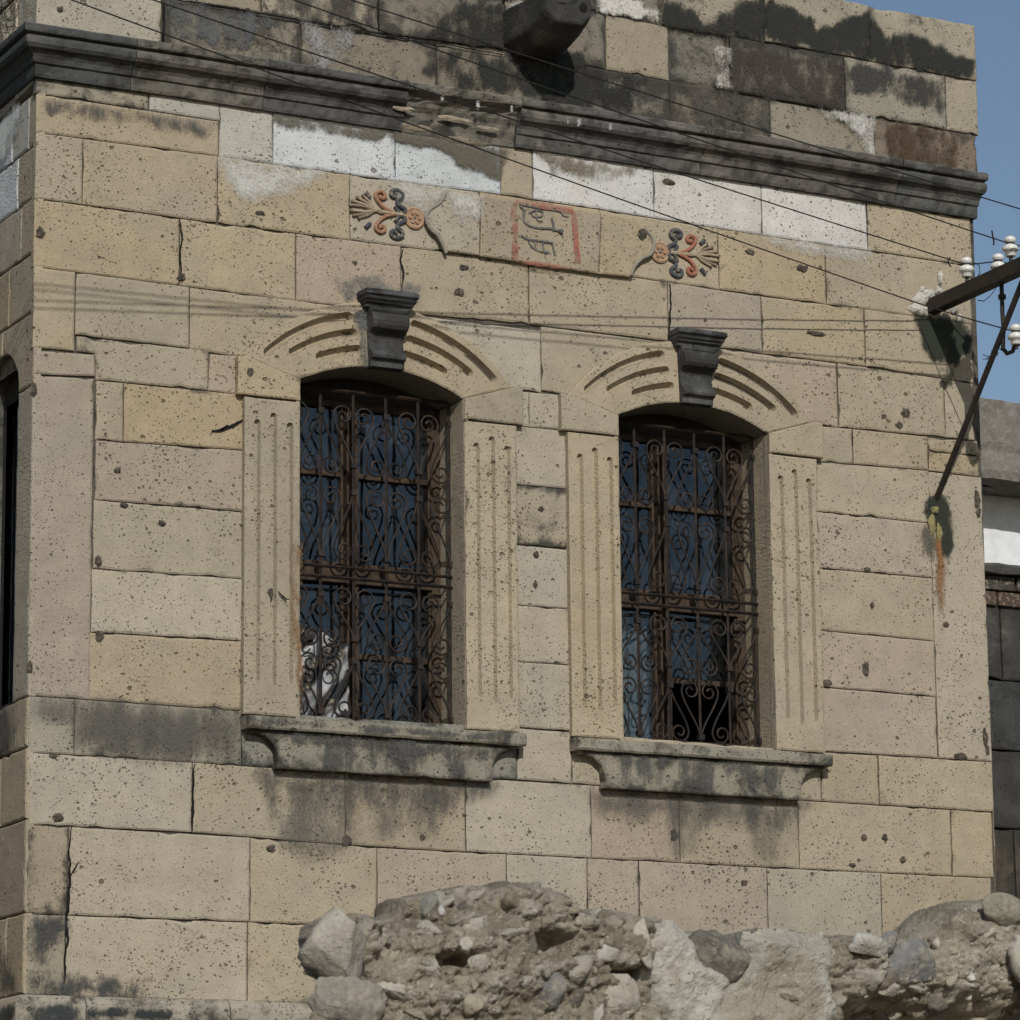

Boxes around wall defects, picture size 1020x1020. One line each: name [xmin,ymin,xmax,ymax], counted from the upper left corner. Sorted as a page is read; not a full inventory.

leakage [273,113,508,180]
leakage [539,151,633,177]
crack [176,219,184,282]
leakage [915,314,973,385]
corrosion [935,537,946,608]
crack [64,826,79,984]
peeling [411,886,488,954]
peeling [429,881,557,1020]
peeling [562,903,635,1020]
peeling [835,905,1020,1020]